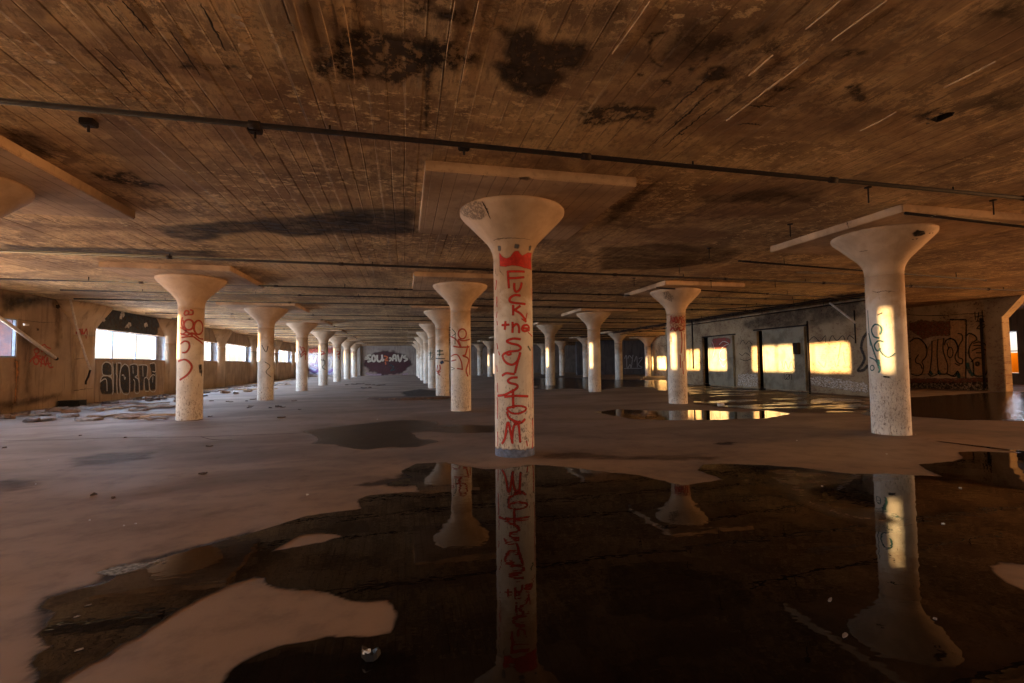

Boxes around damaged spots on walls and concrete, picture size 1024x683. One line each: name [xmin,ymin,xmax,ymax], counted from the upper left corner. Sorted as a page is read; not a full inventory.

crack [200,3,225,50]
damp [312,28,478,127]
damp [496,28,587,97]
damp [579,103,657,125]
spalling [913,107,955,124]
damp [92,172,163,188]